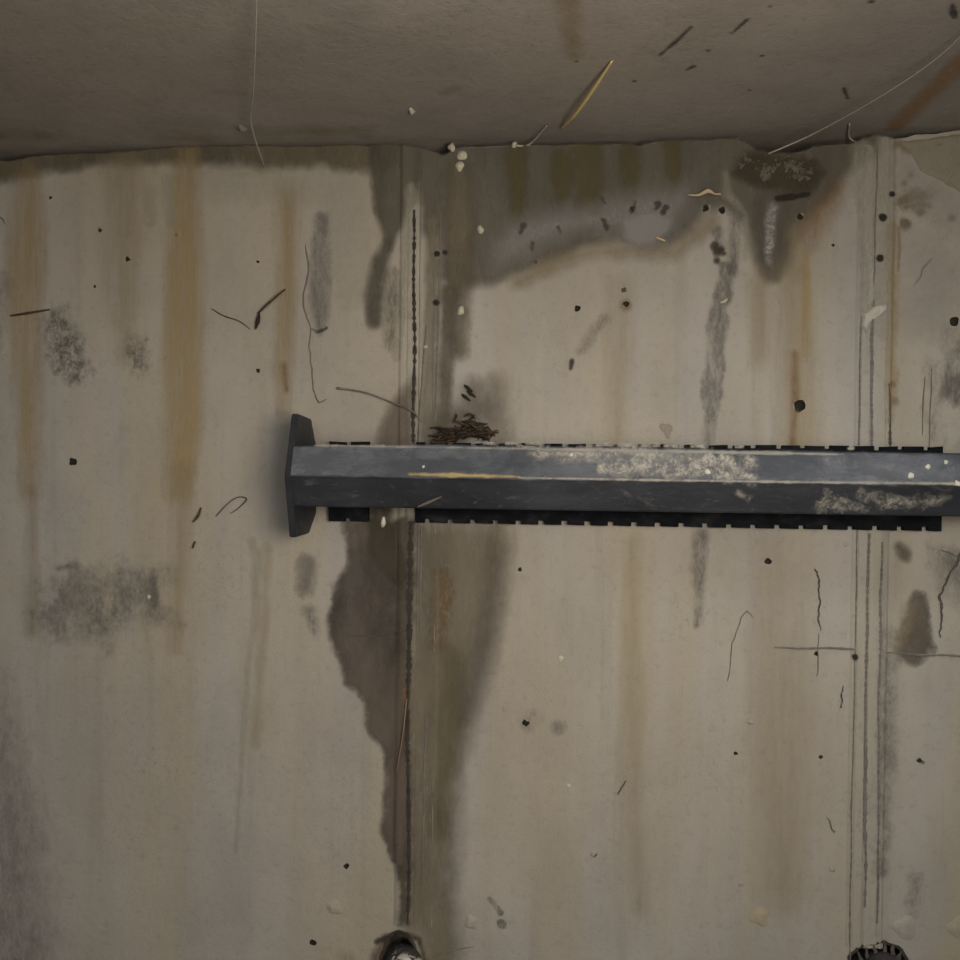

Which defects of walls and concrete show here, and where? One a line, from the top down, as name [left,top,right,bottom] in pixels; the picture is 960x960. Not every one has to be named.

damp [0,135,893,446]
crack [775,569,854,675]
damp [898,593,934,665]
crack [886,550,960,657]
damp [328,508,503,960]